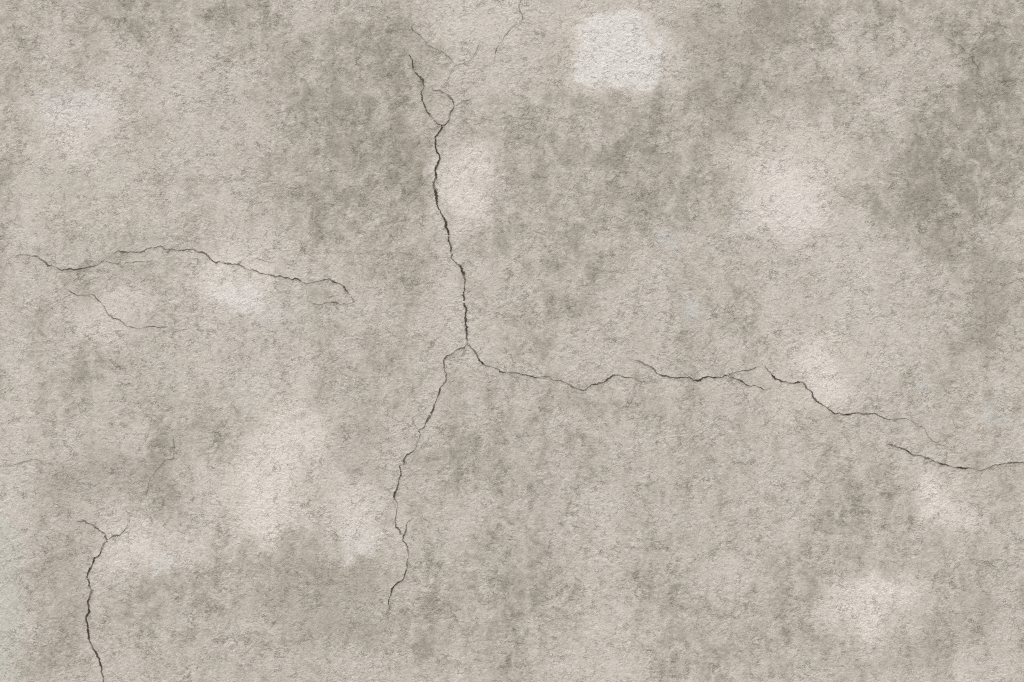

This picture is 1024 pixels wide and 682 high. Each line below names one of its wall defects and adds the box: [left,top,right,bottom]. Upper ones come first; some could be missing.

crack [14,244,356,332]
crack [386,0,1024,611]
crack [75,518,130,682]